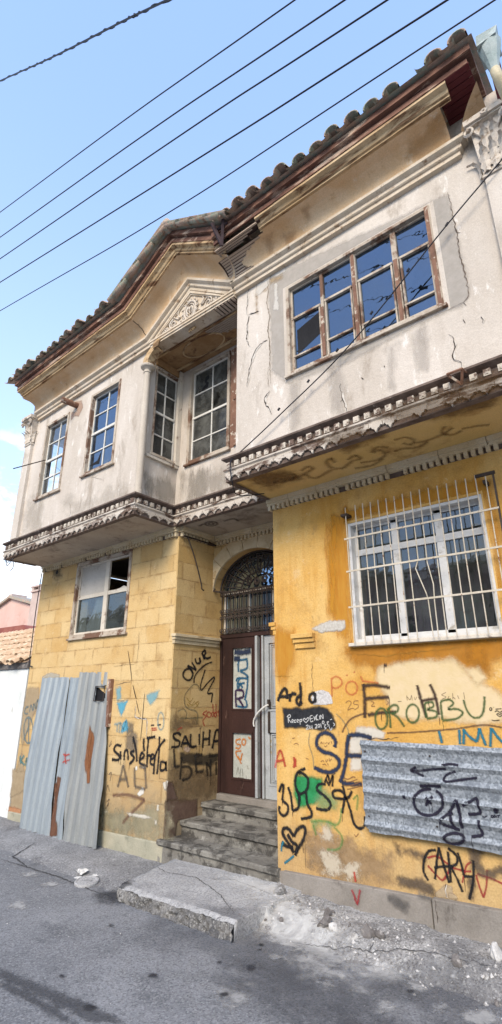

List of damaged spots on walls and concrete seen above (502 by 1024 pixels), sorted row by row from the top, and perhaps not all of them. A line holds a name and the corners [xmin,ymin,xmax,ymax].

crack [246,281,272,414]
crack [448,196,485,367]
peeling [377,658,502,725]